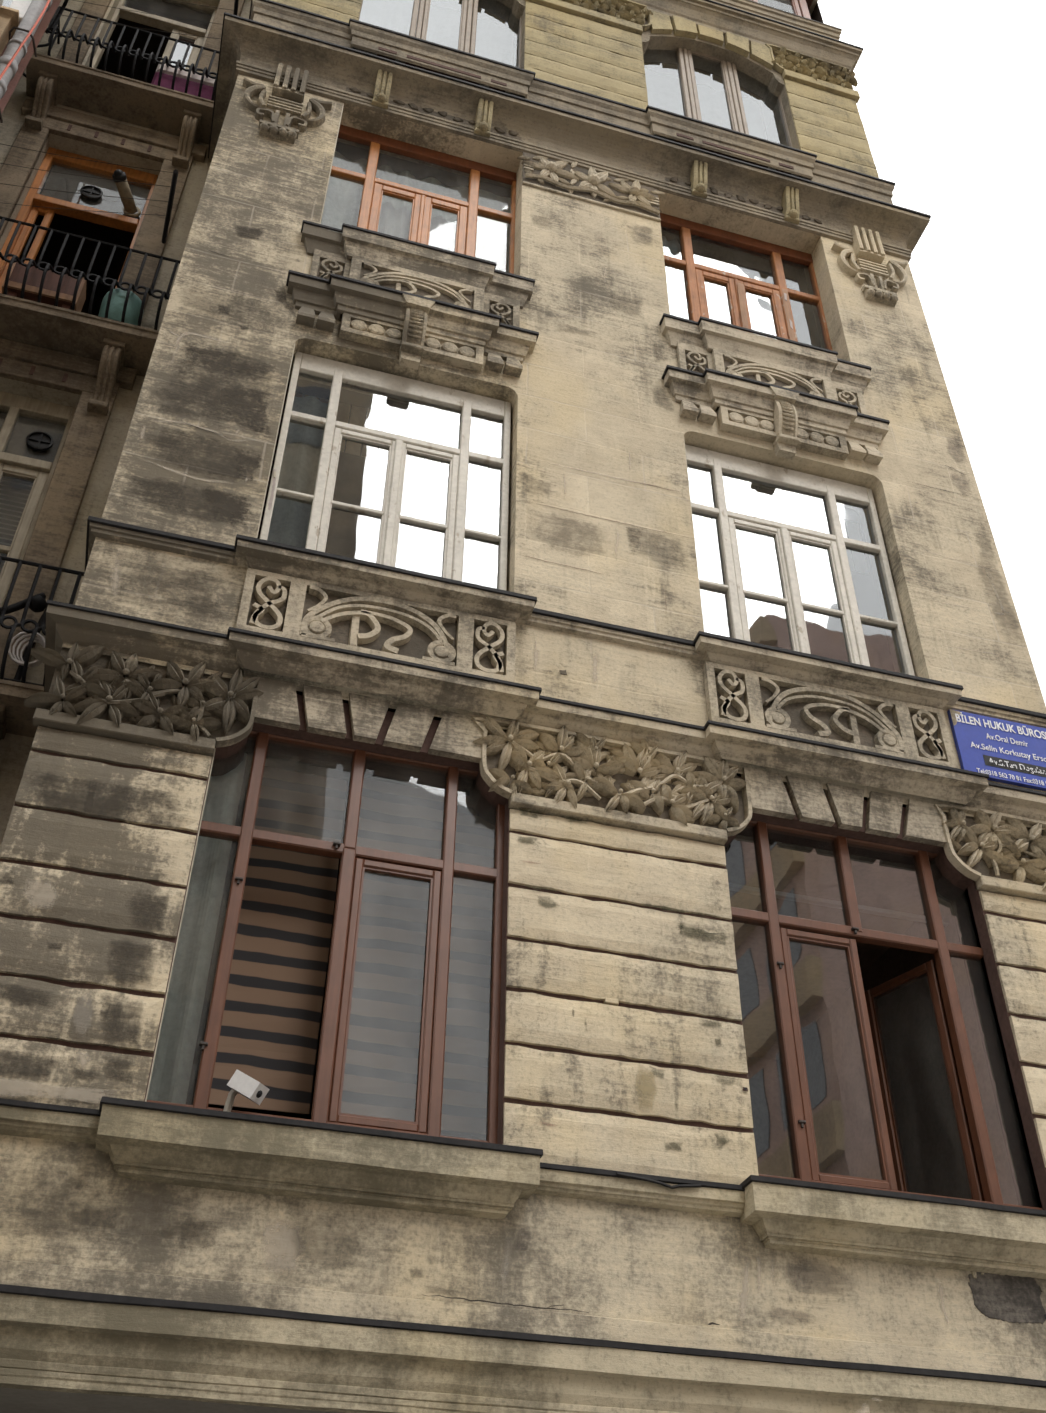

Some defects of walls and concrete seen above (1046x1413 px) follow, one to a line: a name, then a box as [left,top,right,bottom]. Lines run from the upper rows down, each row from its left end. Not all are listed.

spalling [968,1271,1046,1324]